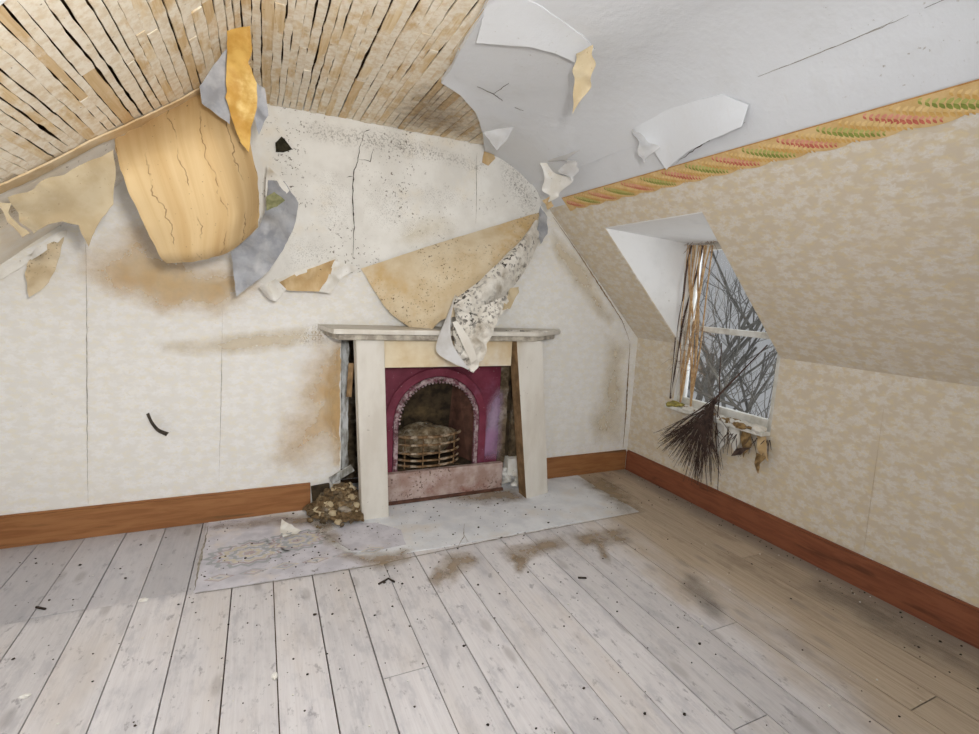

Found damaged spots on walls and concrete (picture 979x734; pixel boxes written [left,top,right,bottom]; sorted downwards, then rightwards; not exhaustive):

crack [758,0,943,77]
flaking render [275,137,292,152]
peeling [482,127,514,166]
crack [349,130,373,249]
damp [108,244,235,304]
damp [305,348,341,442]